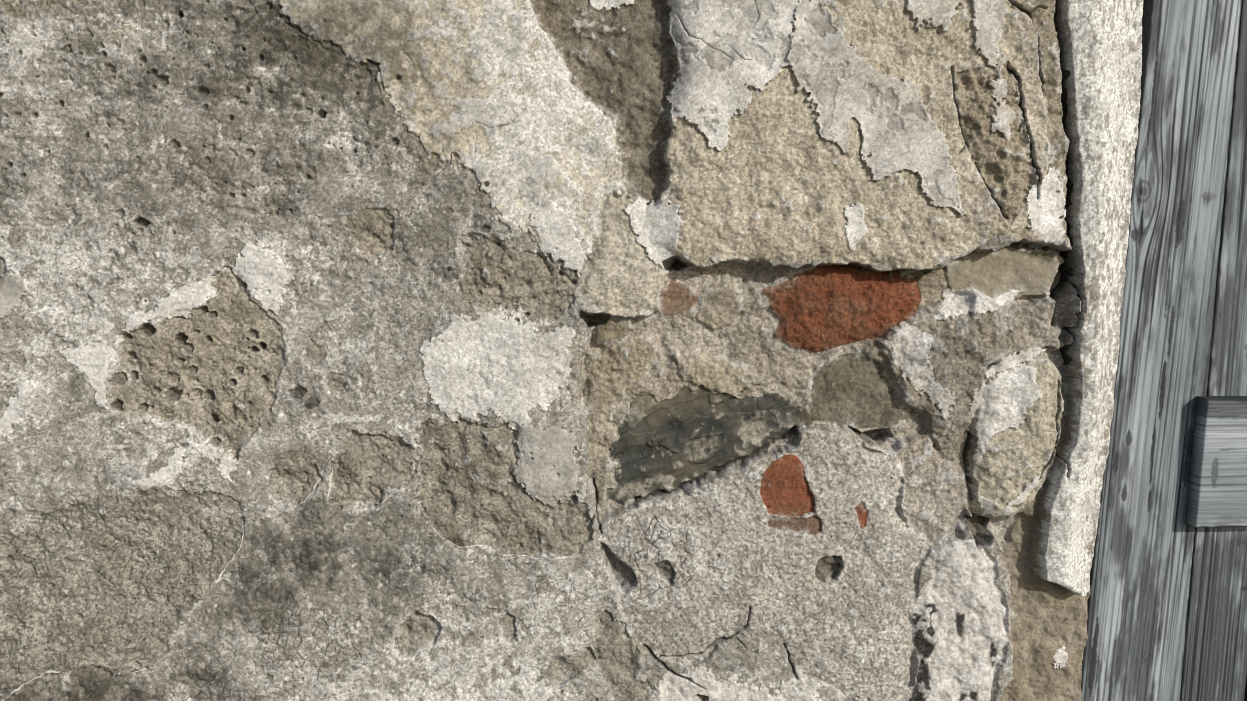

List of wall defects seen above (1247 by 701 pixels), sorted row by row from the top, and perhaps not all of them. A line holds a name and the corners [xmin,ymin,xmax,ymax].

spalling [906,0,1071,262]
peeling [269,0,967,560]
spalling [0,240,287,701]
spalling [908,290,1090,701]
spalling [392,610,442,660]
spalling [499,610,517,646]
spalling [549,610,816,701]
crack [646,607,750,683]